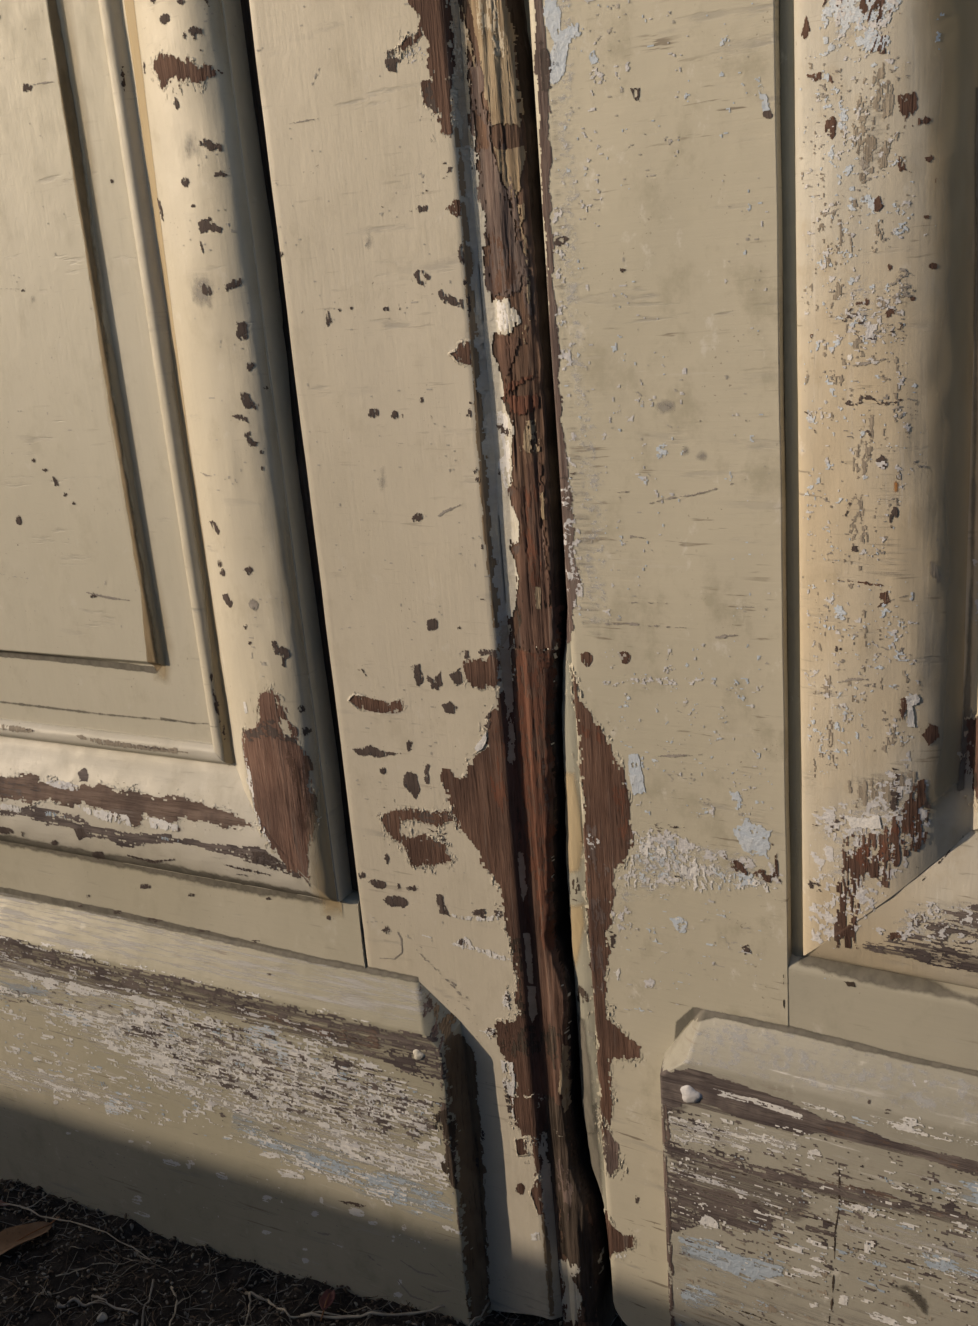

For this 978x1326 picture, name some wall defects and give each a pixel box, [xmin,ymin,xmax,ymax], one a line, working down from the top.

peeling [143,26,228,109]
peeling [0,673,322,886]
peeling [347,691,406,715]
peeling [358,0,783,1216]
peeling [0,935,462,1242]
peeling [598,1207,640,1274]
peeling [660,1062,978,1326]